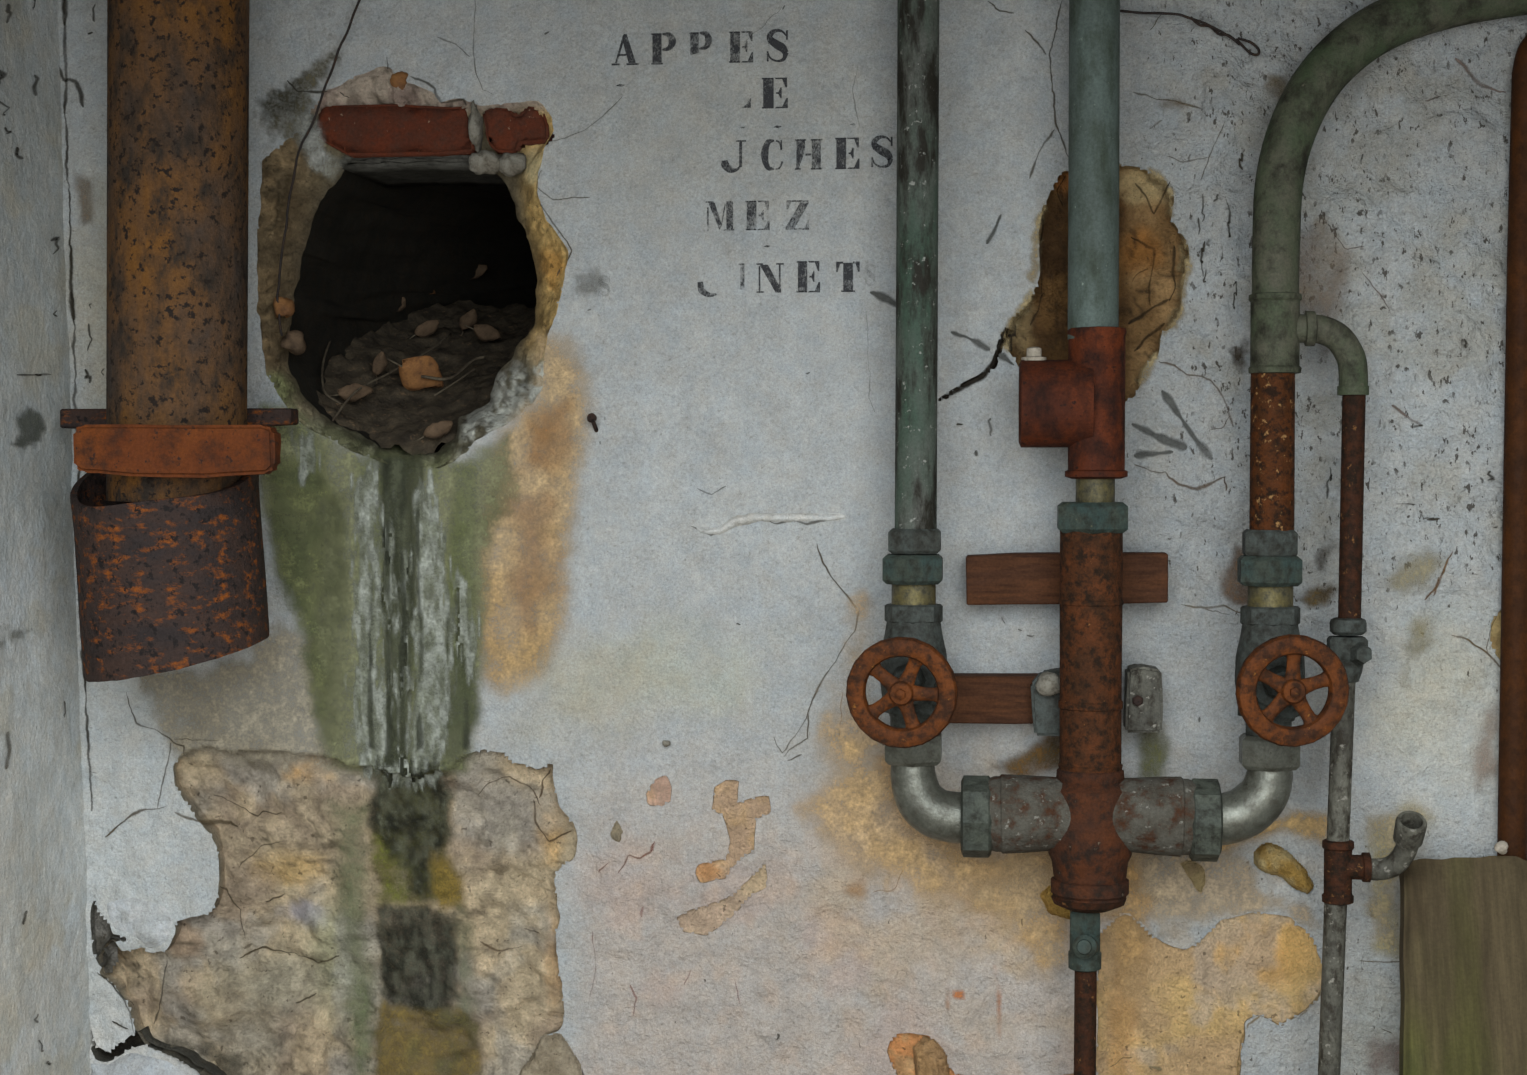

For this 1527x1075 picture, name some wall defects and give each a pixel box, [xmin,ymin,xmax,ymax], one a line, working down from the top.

crack [988,1,1068,179]
crack [1133,92,1225,179]
hole [257,67,568,468]
flaking render [951,171,1068,367]
flaking render [1119,164,1192,402]
damp [291,431,320,485]
rust [479,342,585,690]
damp [141,457,480,1067]
crack [91,964,225,1075]
flaking render [90,749,584,1075]
flaking render [887,1033,961,1075]
peeling [1096,912,1322,1075]